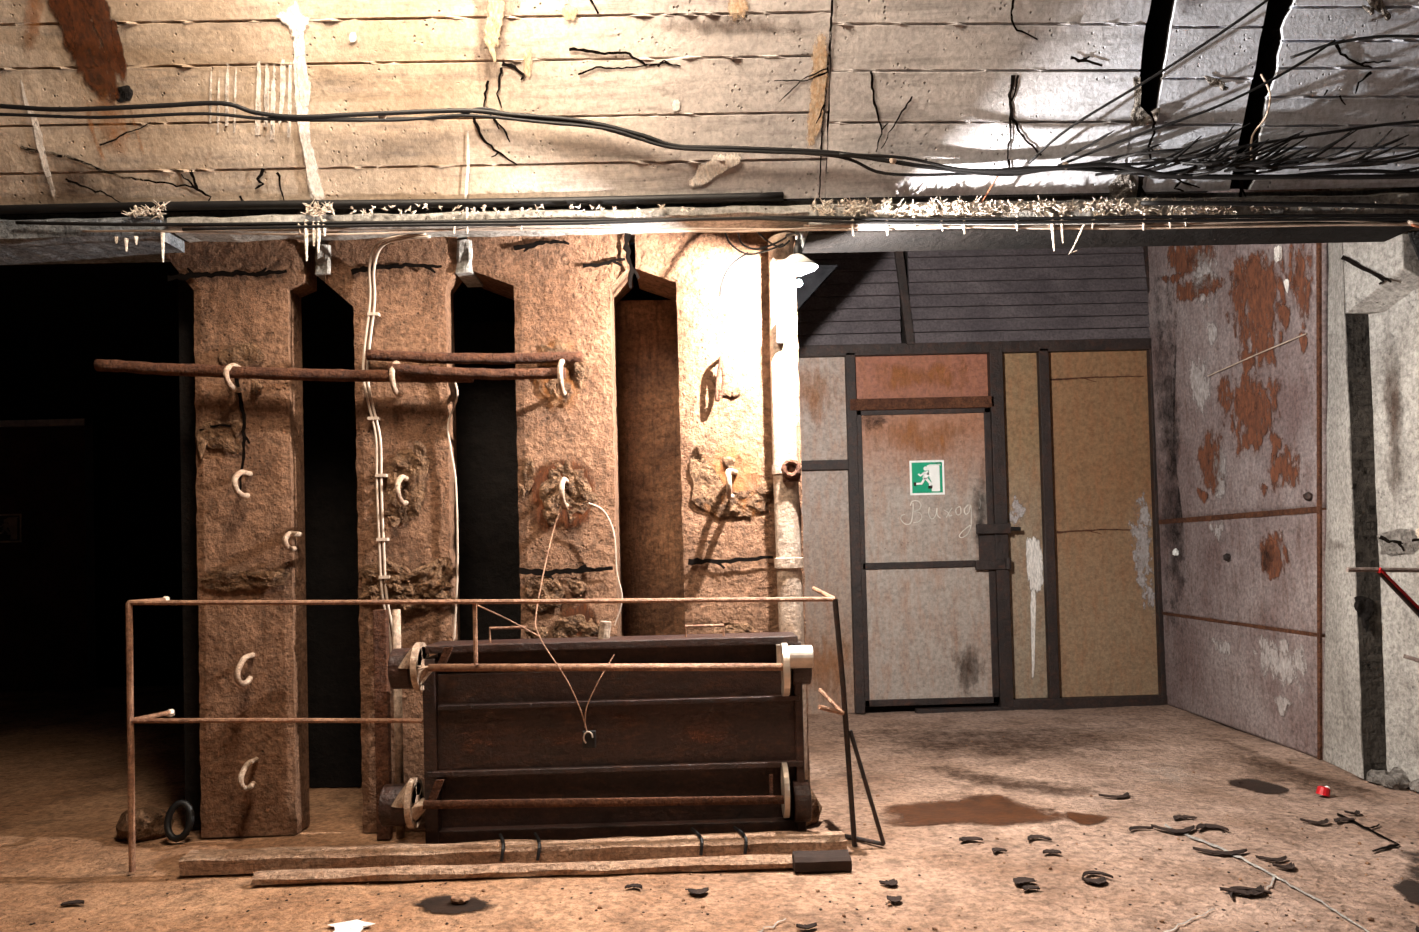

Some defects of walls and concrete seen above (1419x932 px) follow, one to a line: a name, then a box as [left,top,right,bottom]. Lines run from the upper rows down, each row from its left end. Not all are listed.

crack [1010,0,1038,40]
crack [569,47,681,75]
crack [870,71,913,152]
spalling [1130,77,1160,127]
spalling [384,440,429,529]
spalling [519,457,598,526]
spalling [357,557,455,616]
spalling [523,576,599,639]
leakage [885,766,1109,826]
leakage [1393,850,1419,903]